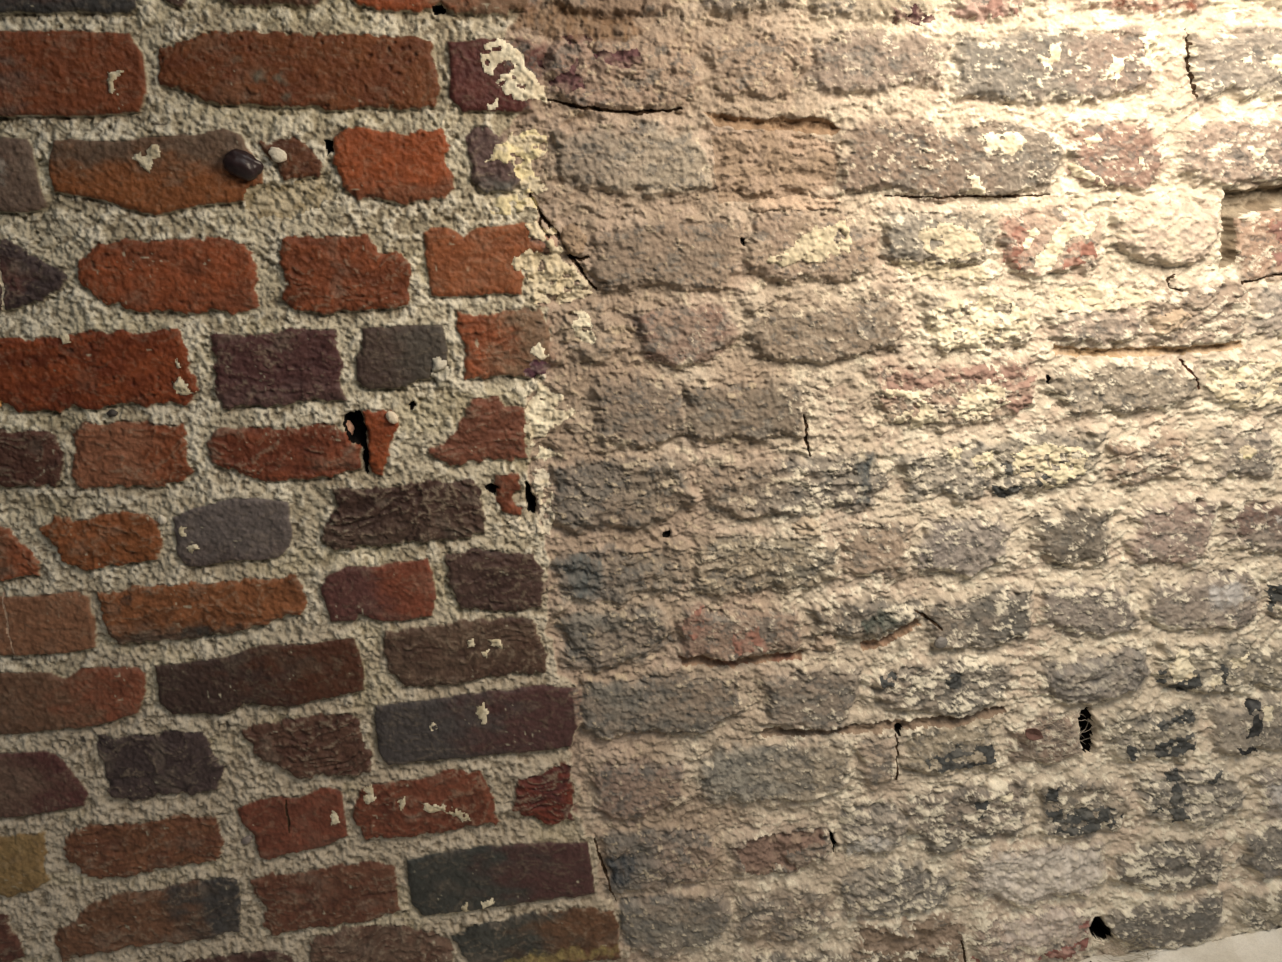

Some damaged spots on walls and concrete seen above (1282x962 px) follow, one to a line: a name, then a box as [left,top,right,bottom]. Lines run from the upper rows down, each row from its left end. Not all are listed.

peeling [582,0,647,26]
peeling [480,33,642,110]
crack [1184,28,1199,99]
crack [1241,273,1282,285]